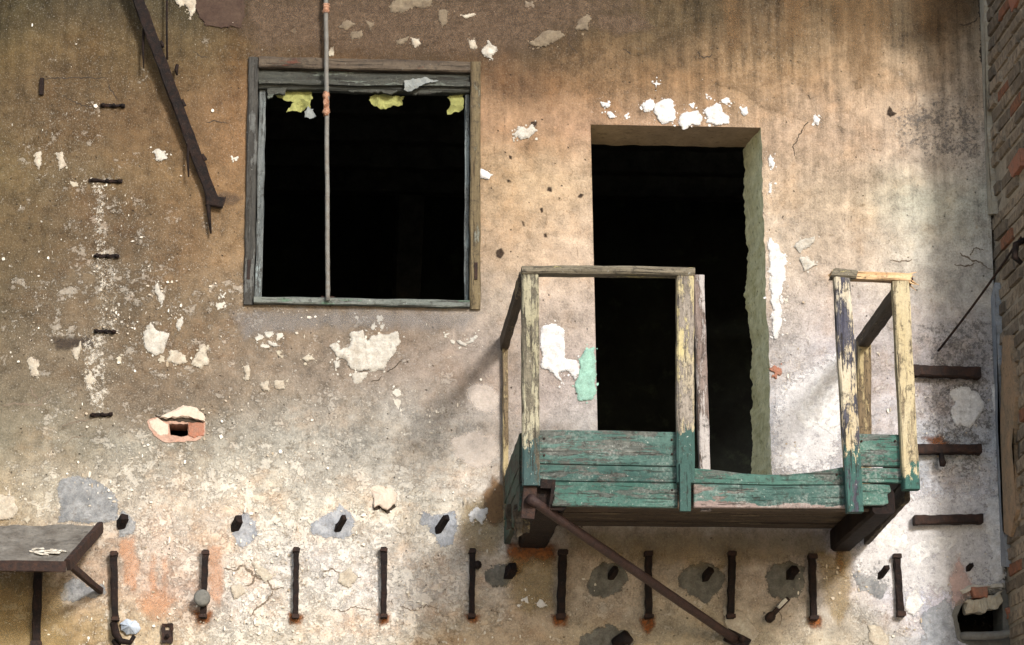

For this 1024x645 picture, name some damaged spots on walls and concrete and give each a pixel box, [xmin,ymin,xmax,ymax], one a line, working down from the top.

crack [960,0,982,62]
peeling [600,77,748,130]
crack [954,215,996,280]
peeling [764,229,820,339]
peeling [72,340,99,396]
peeling [103,279,210,382]
peeling [329,313,404,384]
peeling [540,320,599,403]
spalling [123,392,243,476]
peeling [946,382,995,434]
rust [507,543,555,575]
peeling [947,495,1010,645]